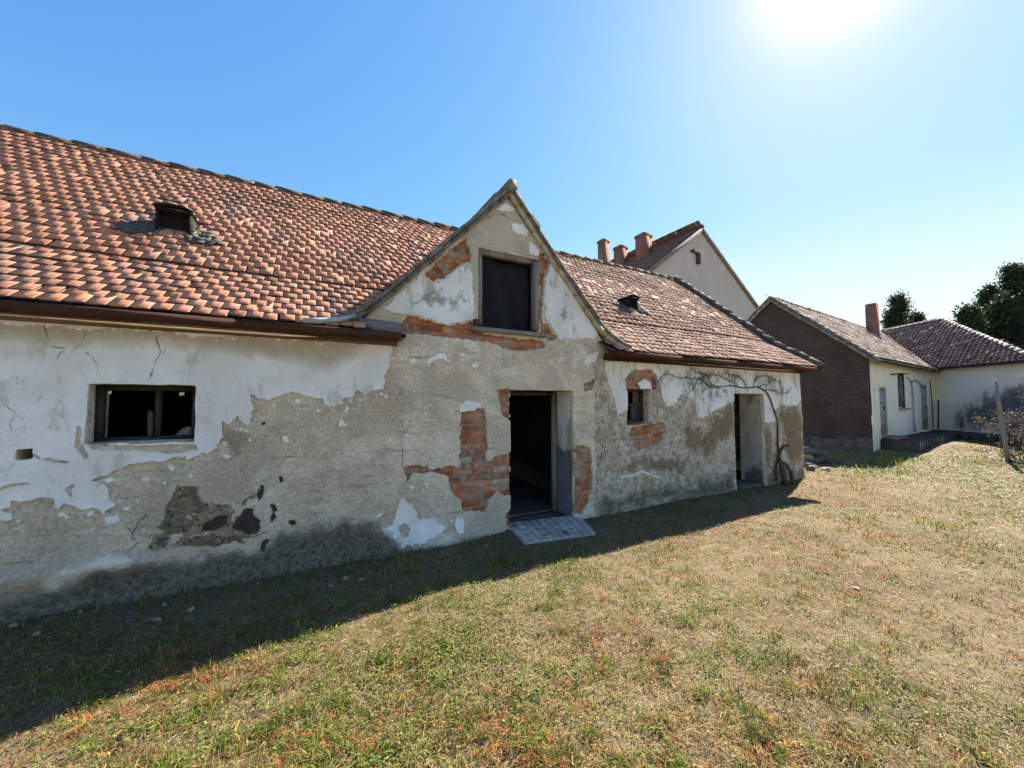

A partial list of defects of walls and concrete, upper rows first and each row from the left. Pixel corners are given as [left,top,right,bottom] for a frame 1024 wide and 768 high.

flaking render [0,203,556,606]